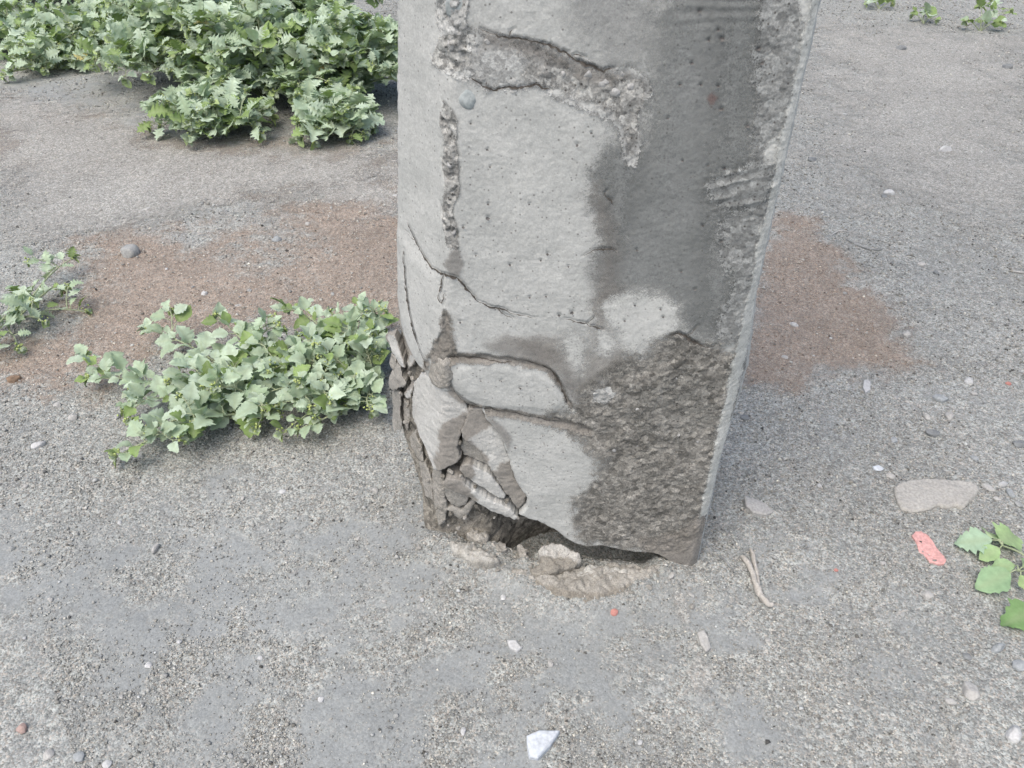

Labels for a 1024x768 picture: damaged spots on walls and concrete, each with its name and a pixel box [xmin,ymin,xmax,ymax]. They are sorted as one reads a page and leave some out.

crack [403,223,531,368]
crack [450,356,567,421]
spalling [385,0,812,552]
water stain [574,0,762,342]